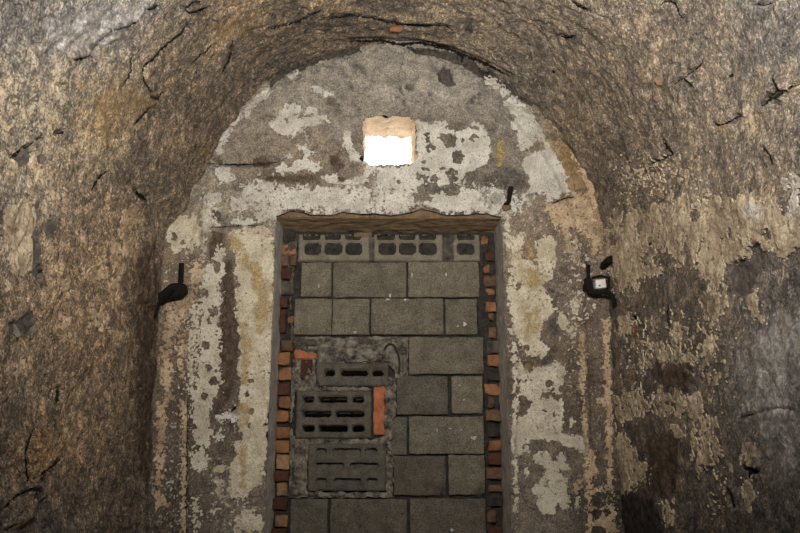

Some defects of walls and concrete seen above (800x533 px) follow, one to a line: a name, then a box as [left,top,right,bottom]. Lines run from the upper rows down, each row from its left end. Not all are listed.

crack [74,4,159,61]
crack [121,1,208,125]
crack [268,10,509,76]
crack [674,63,702,86]
crack [761,79,800,106]
crack [208,160,277,168]
crack [653,139,674,163]
peeling [150,46,800,533]
water stain [655,361,689,392]
water stain [747,317,800,469]
water stain [621,434,678,533]